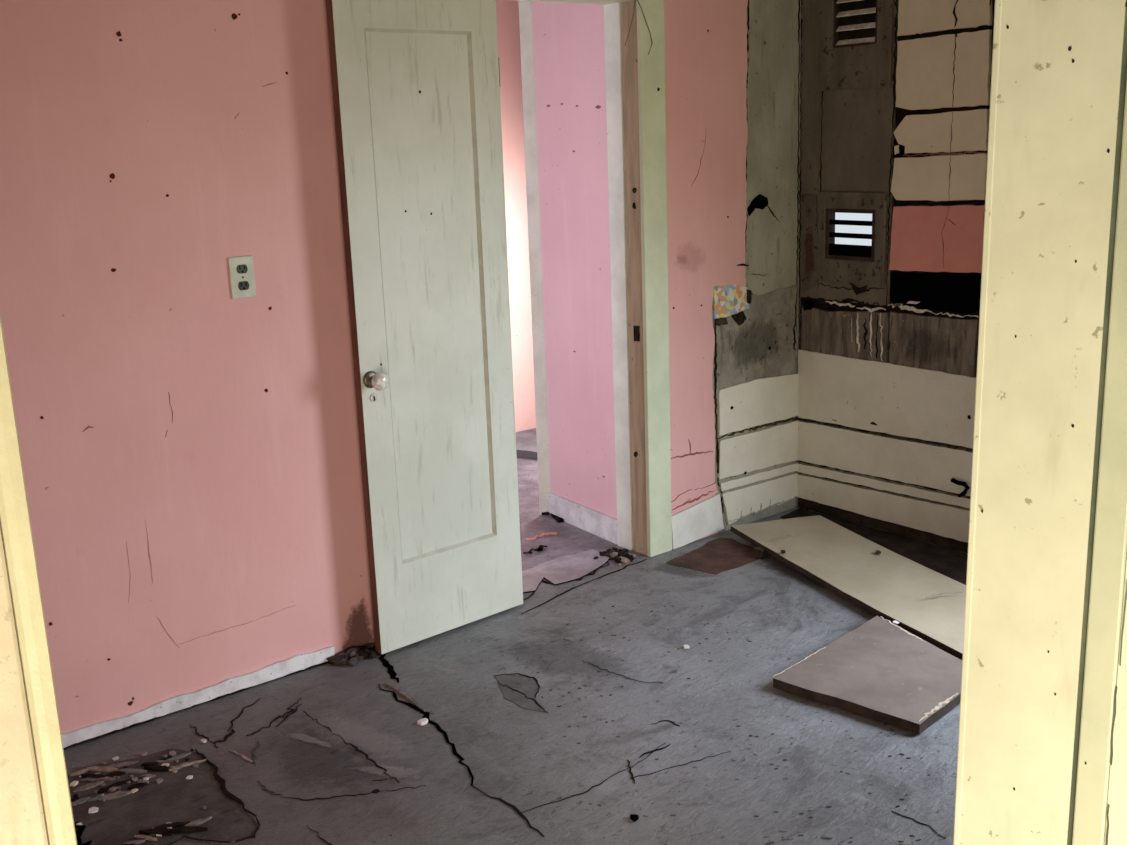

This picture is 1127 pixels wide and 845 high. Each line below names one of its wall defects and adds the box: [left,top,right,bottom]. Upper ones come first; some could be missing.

peeling [70,739,207,826]
peeling [120,806,212,845]
crack [379,654,730,837]